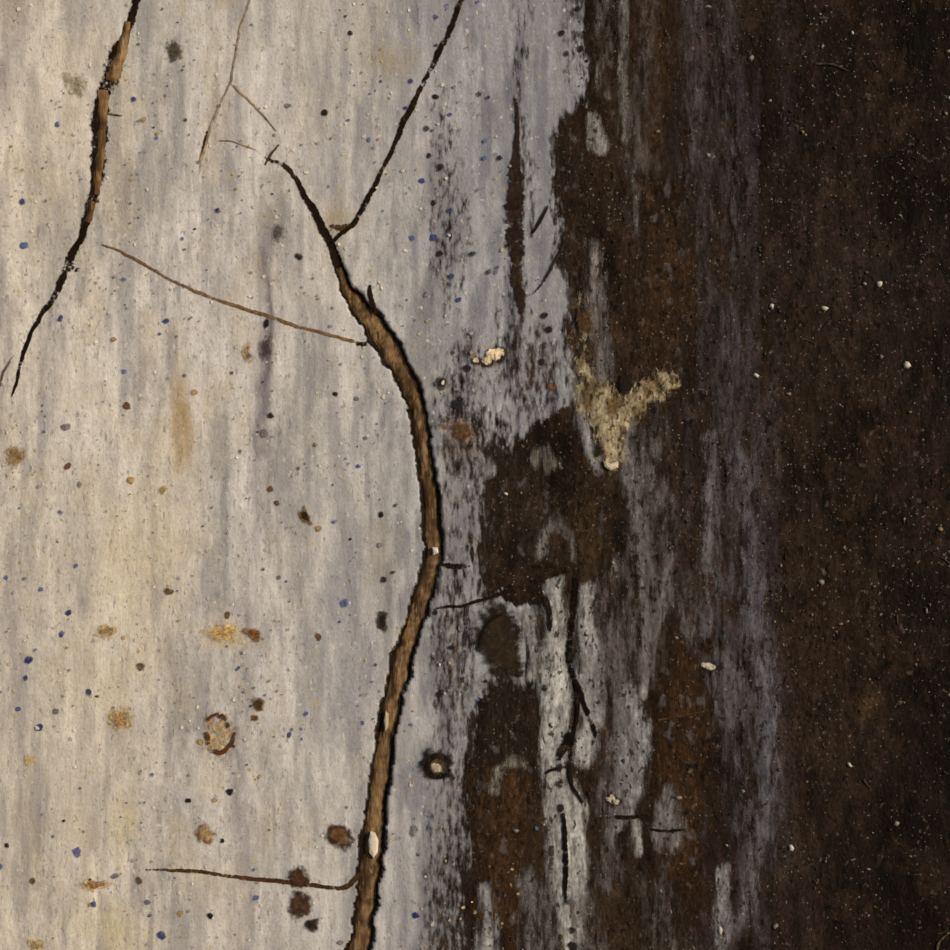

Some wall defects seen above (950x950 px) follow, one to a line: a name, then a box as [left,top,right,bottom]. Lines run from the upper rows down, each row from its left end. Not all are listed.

peeling [587,112,607,156]
peeling [595,0,659,233]
peeling [680,120,739,228]
spalling [434,377,447,390]
crack [0,0,597,950]
water stain [422,0,950,950]
hole [420,748,456,781]